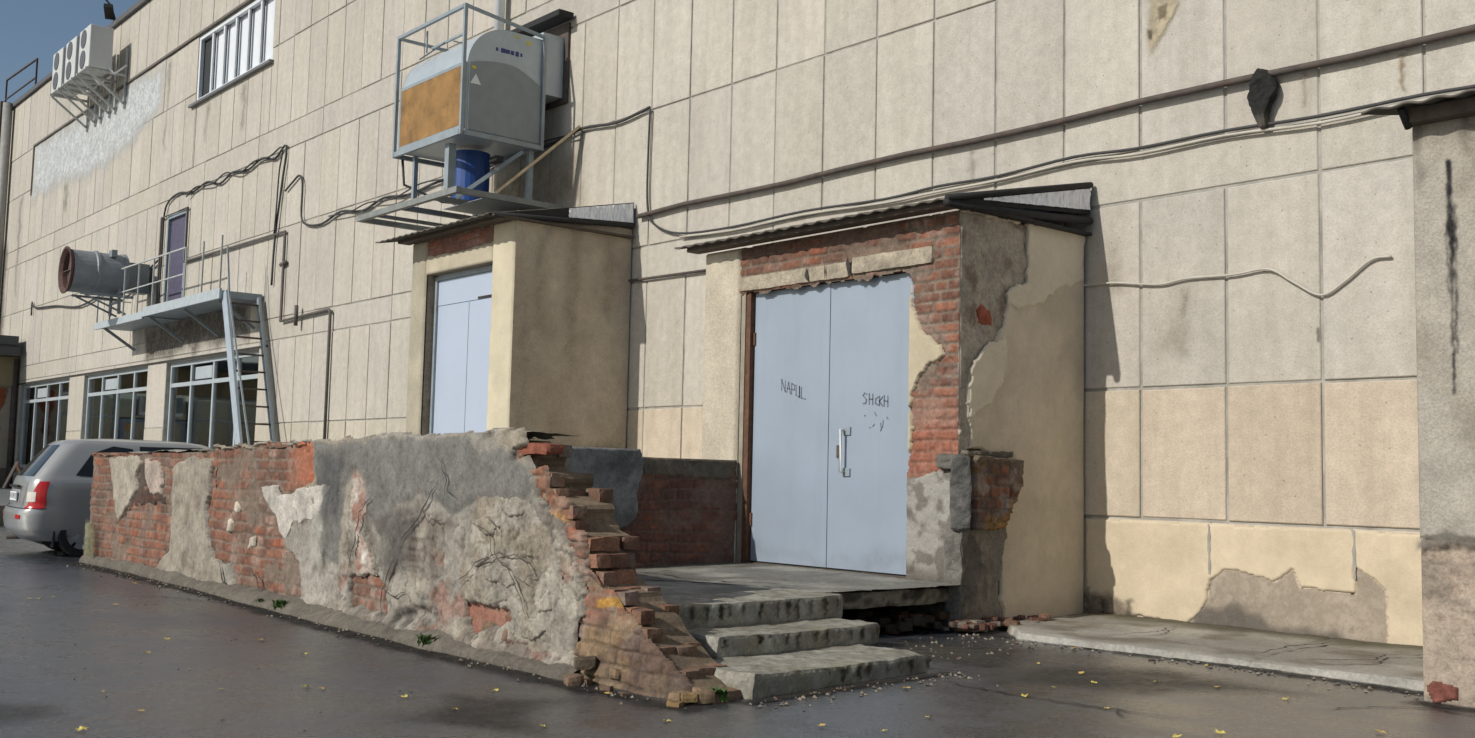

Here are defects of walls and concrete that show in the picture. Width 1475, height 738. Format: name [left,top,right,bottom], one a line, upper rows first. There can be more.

peeling [1147,0,1178,50]
spalling [739,210,1085,479]
leakage [1445,160,1457,391]
spalling [89,442,329,597]
peeling [350,472,388,615]
spalling [469,602,510,634]
spalling [620,457,738,567]
spalling [1086,518,1475,708]